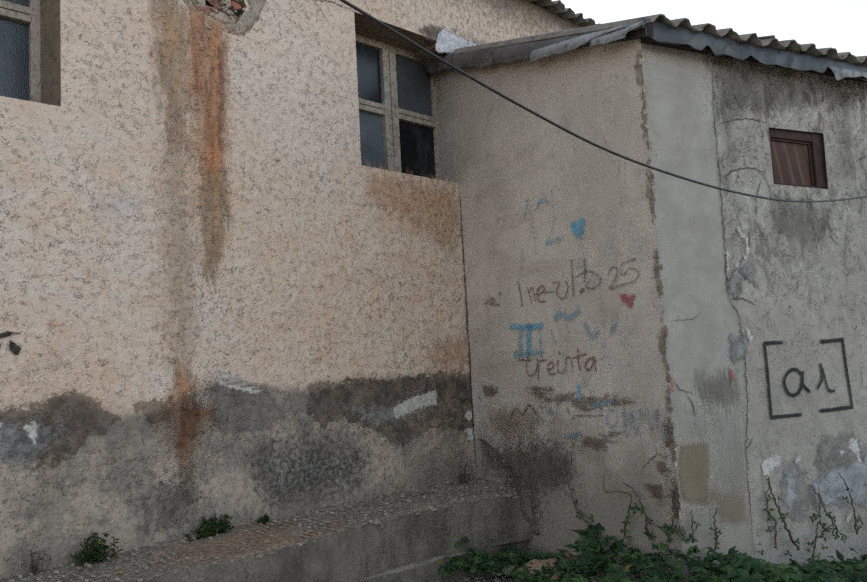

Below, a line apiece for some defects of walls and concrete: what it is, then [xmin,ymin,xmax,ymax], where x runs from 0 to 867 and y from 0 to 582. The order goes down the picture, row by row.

spalling [183,0,266,41]
rust [151,0,229,281]
water stain [141,478,197,529]
rust [171,371,214,469]
water stain [248,434,365,507]
water stain [464,410,475,440]
water stain [482,441,576,525]
water stain [530,386,631,412]
water stain [583,431,621,451]
peeling [761,432,867,523]